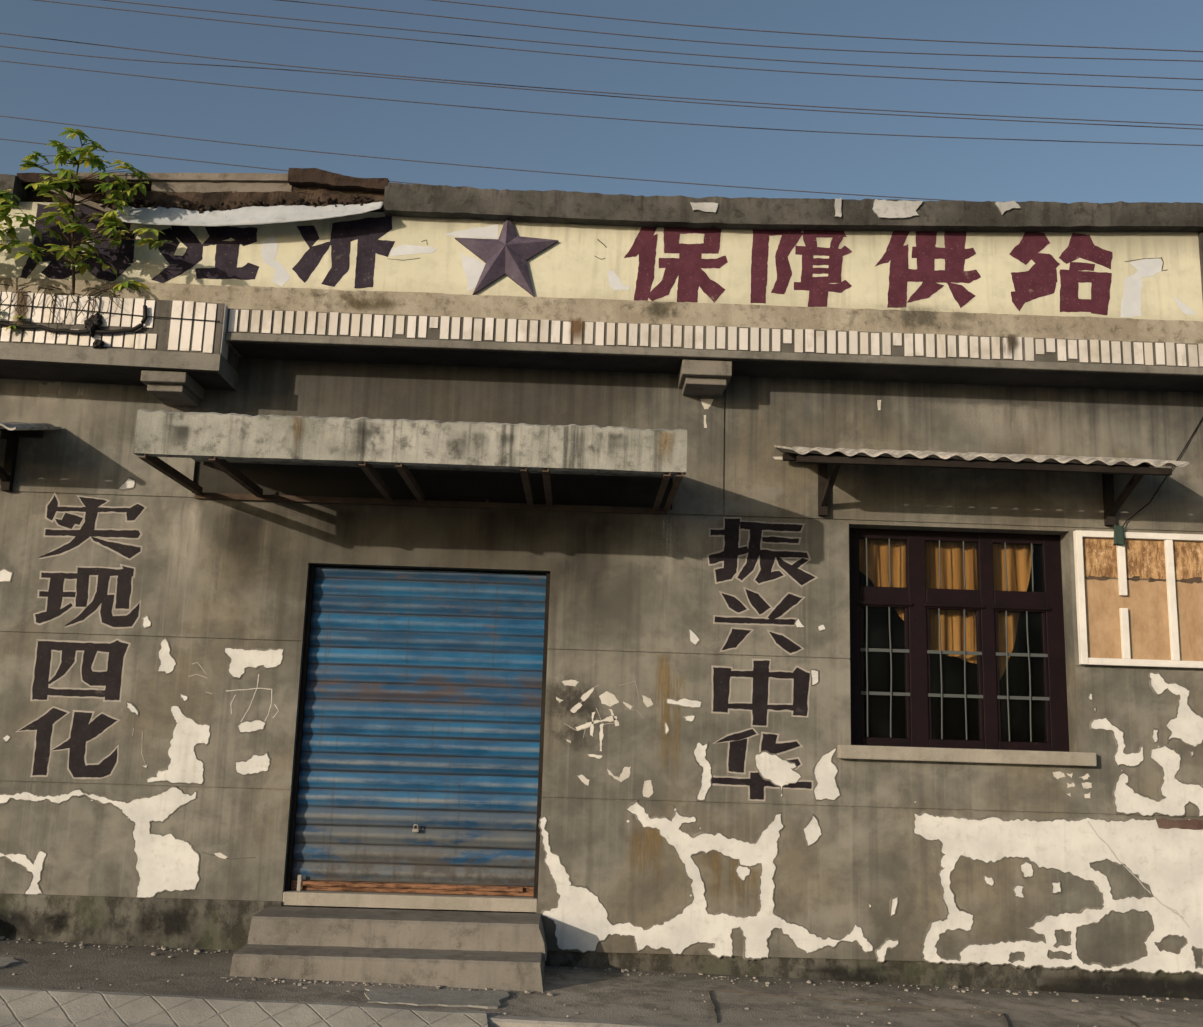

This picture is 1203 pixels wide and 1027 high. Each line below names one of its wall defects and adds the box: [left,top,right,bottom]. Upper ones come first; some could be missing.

peeling [0,568,14,583]
peeling [141,614,152,629]
peeling [157,638,177,675]
peeling [223,646,284,680]
peeling [810,669,820,686]
peeling [237,718,266,734]
peeling [556,680,702,782]
peeling [235,751,272,776]
peeling [0,693,227,898]
peeling [912,672,1203,975]
peeling [539,741,900,963]